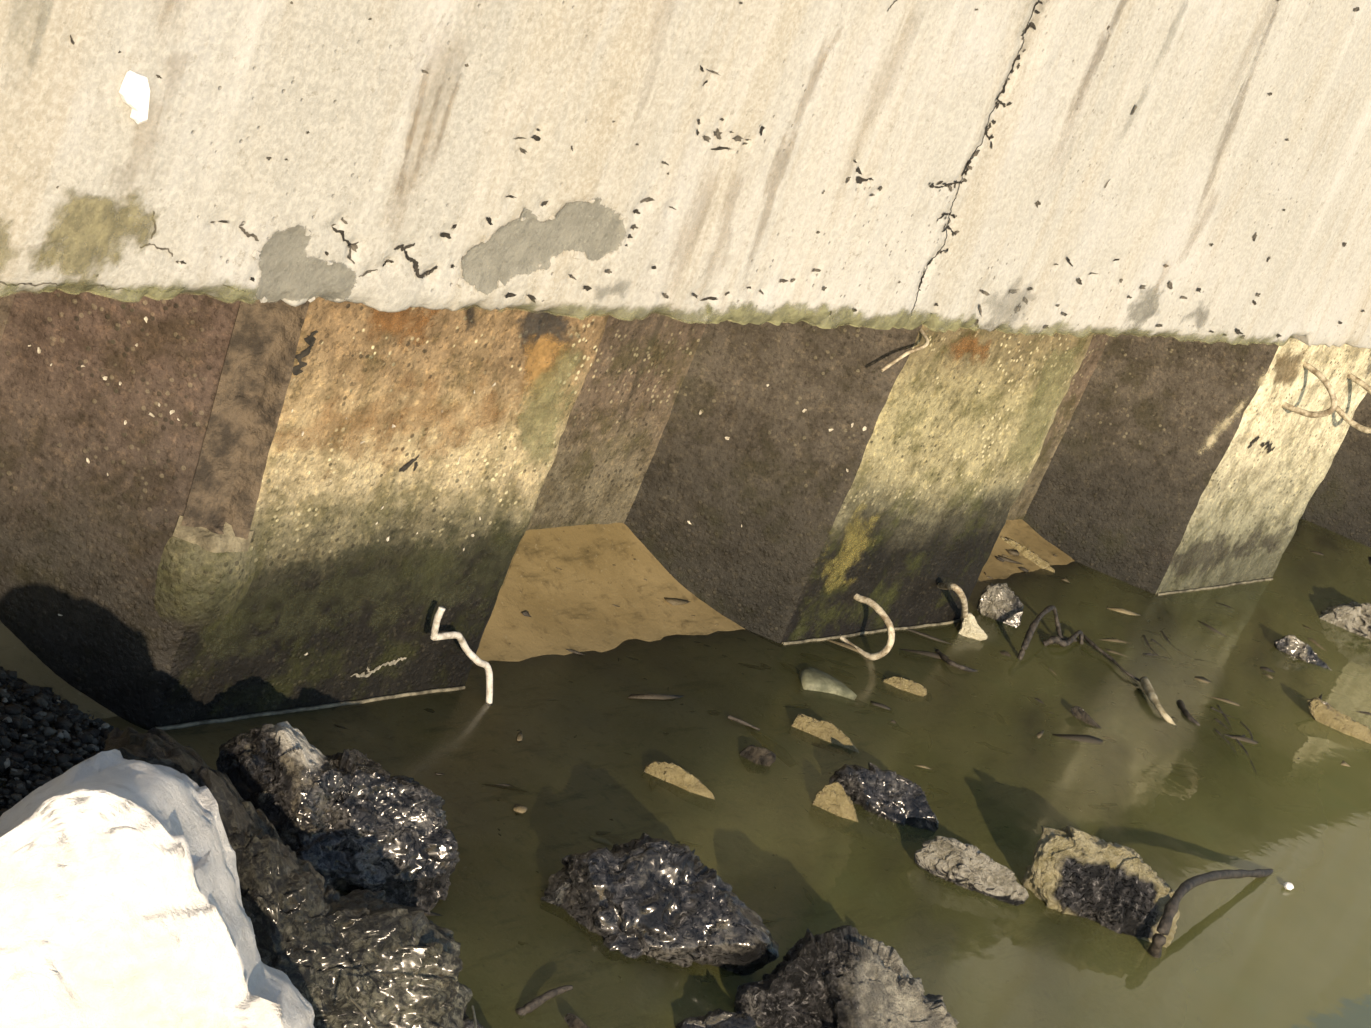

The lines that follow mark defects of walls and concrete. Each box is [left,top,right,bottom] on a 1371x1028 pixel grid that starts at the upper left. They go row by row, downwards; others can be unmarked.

crack [910,1,1042,317]
crack [332,224,438,279]
peeling [457,198,627,295]
spalling [173,225,356,553]
damp [351,657,406,677]